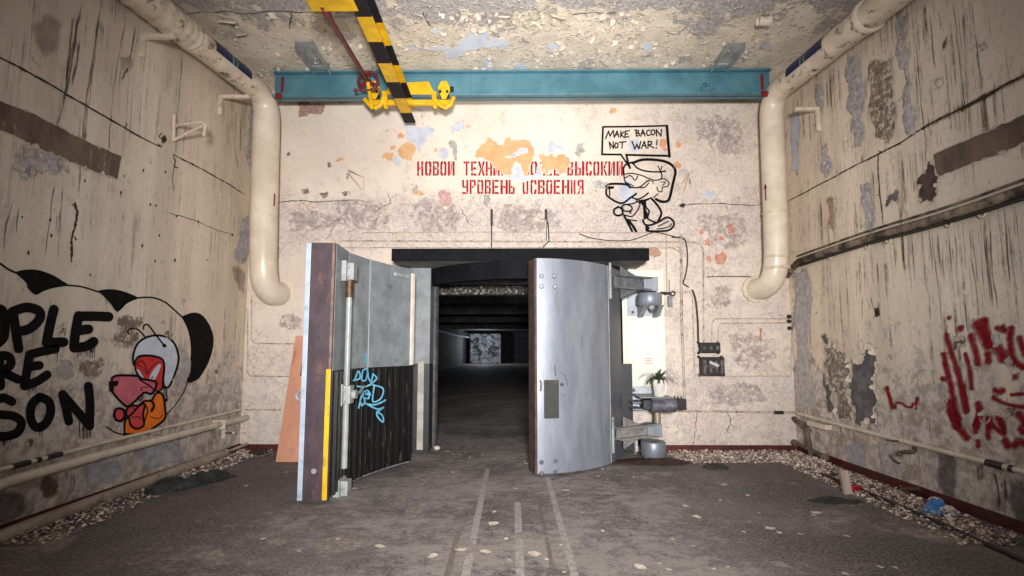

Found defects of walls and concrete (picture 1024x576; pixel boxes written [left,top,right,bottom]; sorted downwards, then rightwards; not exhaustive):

peeling [209,12,379,79]
peeling [396,11,802,70]
peeling [844,7,919,148]
spalling [13,143,68,180]
peeling [475,136,585,182]
spalling [792,268,879,429]